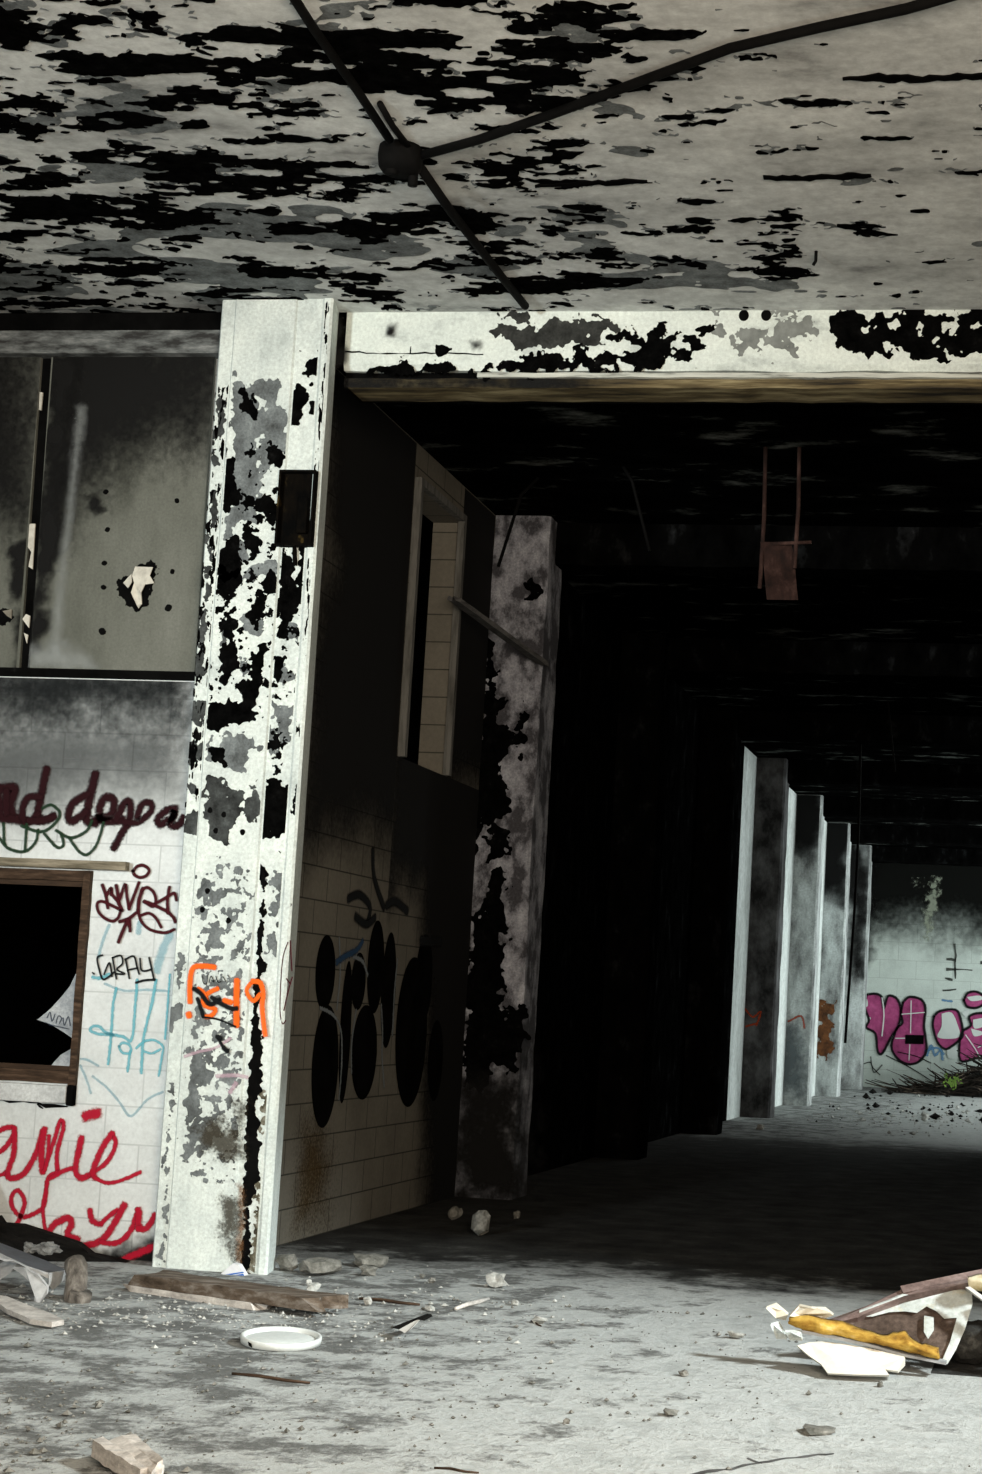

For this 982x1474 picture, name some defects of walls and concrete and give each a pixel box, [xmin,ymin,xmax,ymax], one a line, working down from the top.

peeling [0,0,982,846]
spalling [155,856,282,1274]
peeling [462,638,531,1081]
peeling [817,999,837,1061]
crack [692,1453,834,1474]